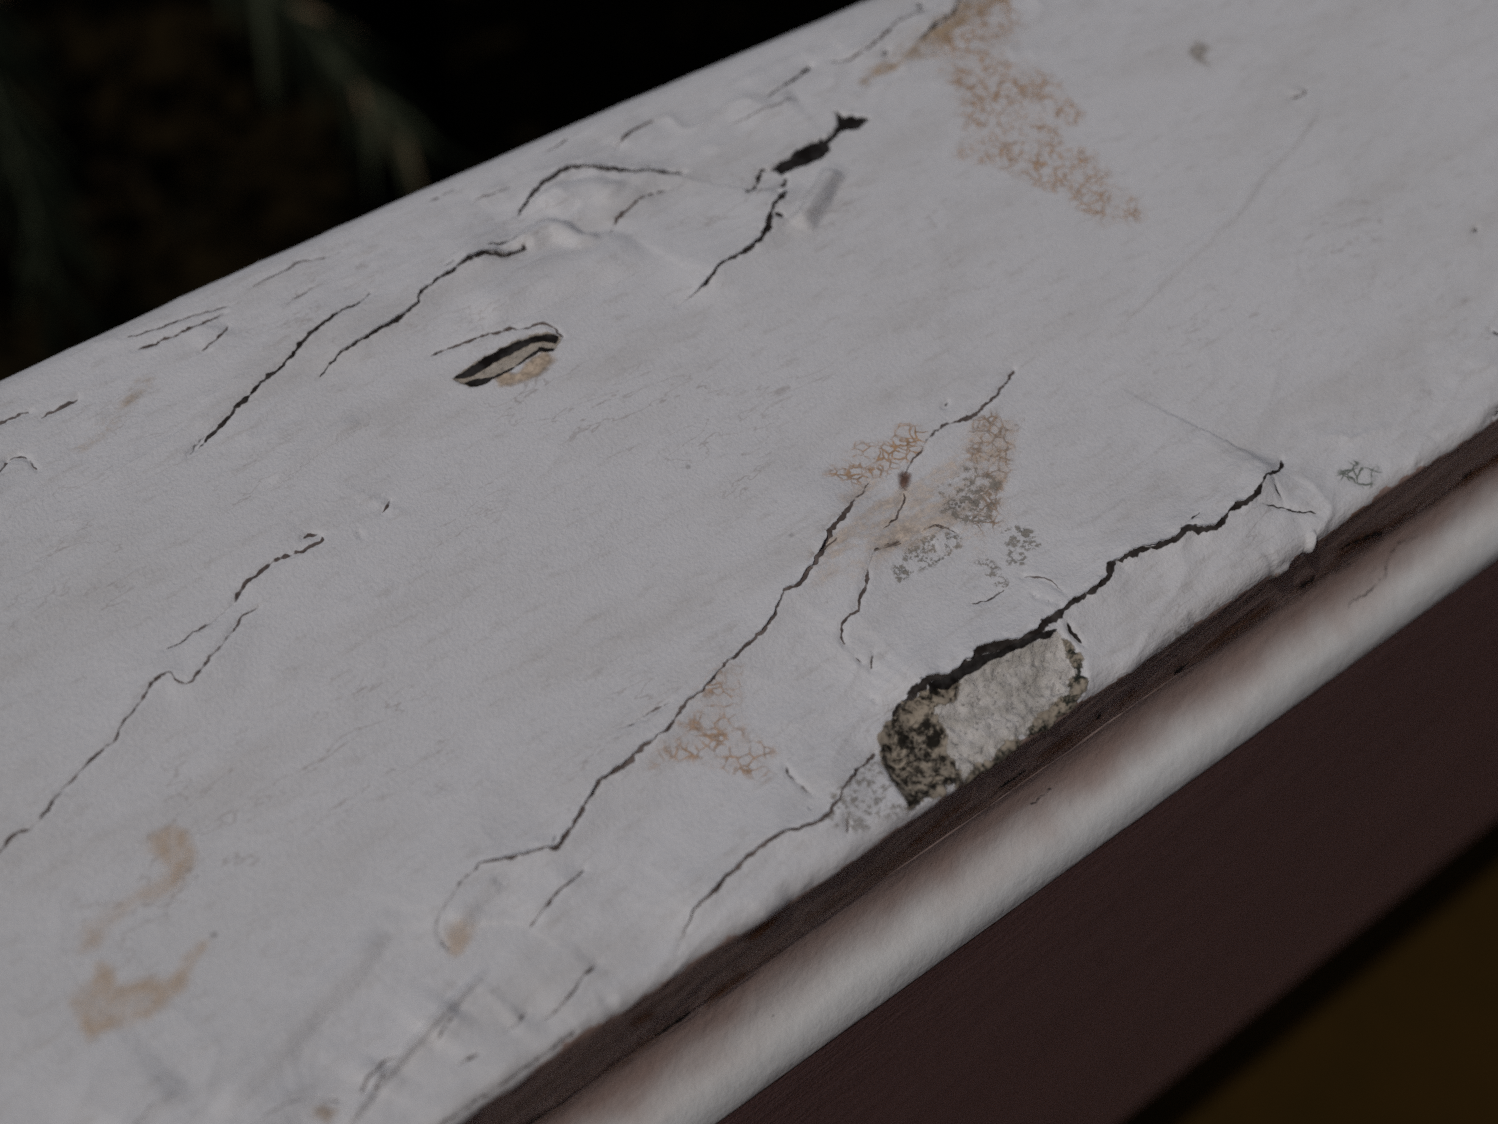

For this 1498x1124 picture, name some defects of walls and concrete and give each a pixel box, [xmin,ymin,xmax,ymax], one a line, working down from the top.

crack [0,400,77,425]
crack [128,307,228,351]
crack [200,120,683,446]
peeling [453,332,561,387]
crack [686,169,787,300]
crack [0,533,324,852]
crack [459,371,1015,934]
spalling [877,629,1089,811]
crack [892,461,1315,720]